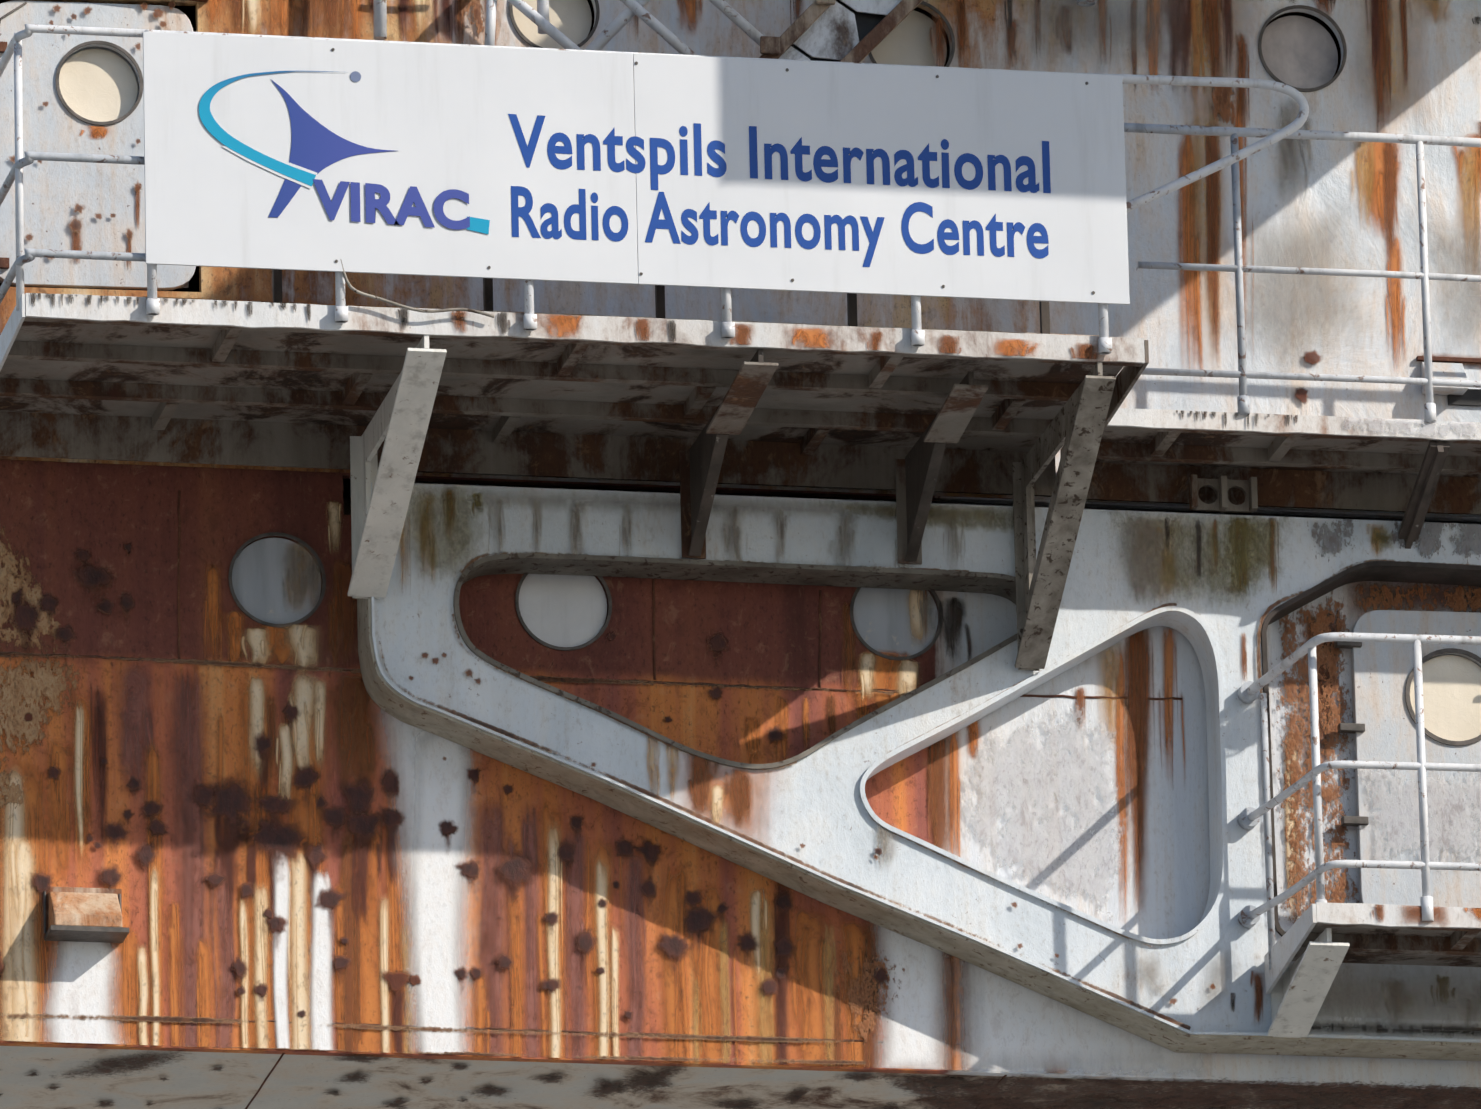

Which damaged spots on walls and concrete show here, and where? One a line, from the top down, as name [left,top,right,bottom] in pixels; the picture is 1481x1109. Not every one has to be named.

rust [400,0,484,40]
rust [1131,0,1254,361]
rust [1304,351,1321,365]
rust [1366,142,1405,356]
rust [1366,0,1407,117]
peeling [0,523,83,809]
rust [0,502,905,1068]
rust [398,604,1005,946]
rust [1116,603,1185,902]
mould [1133,517,1279,595]
rust [1242,529,1481,924]
rust [1052,954,1191,1031]